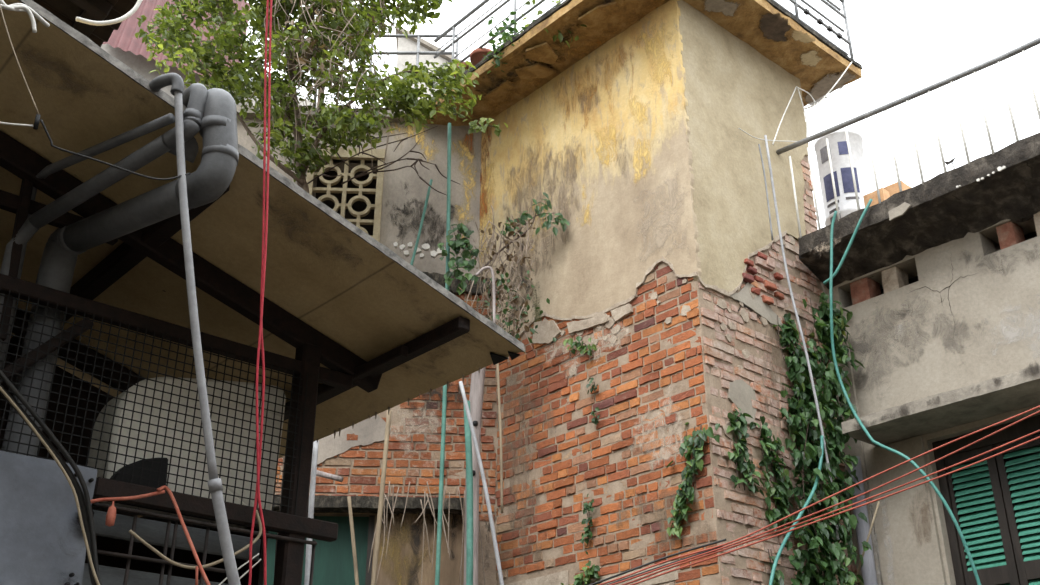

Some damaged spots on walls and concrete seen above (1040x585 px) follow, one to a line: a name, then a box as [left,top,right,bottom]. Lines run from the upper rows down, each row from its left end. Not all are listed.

spalling [578,1,617,28]
spalling [704,0,740,16]
spalling [760,13,822,67]
spalling [486,42,558,101]
spalling [806,72,856,106]
damp [391,201,469,247]
damp [508,145,582,318]
flaking render [532,303,633,376]
flaking render [664,305,691,324]
spalling [716,252,784,342]